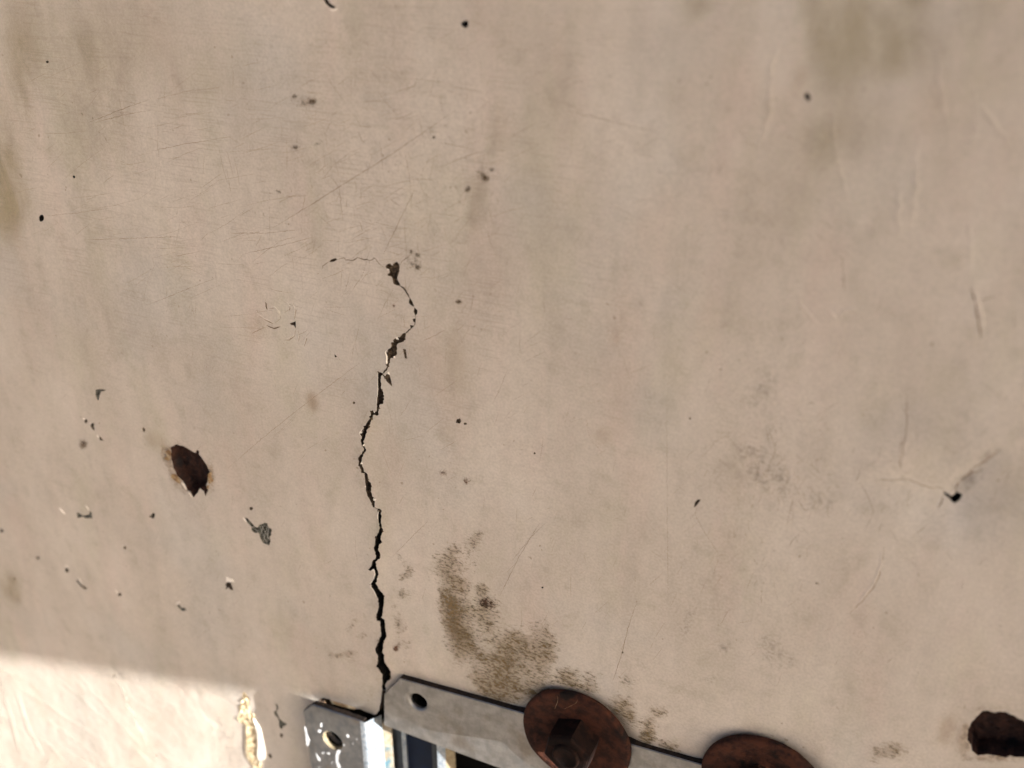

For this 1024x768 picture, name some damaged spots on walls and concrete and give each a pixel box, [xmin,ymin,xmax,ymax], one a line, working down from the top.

peeling [243,507,272,545]
crack [322,255,417,690]
water stain [435,546,595,702]
water stain [608,699,677,752]